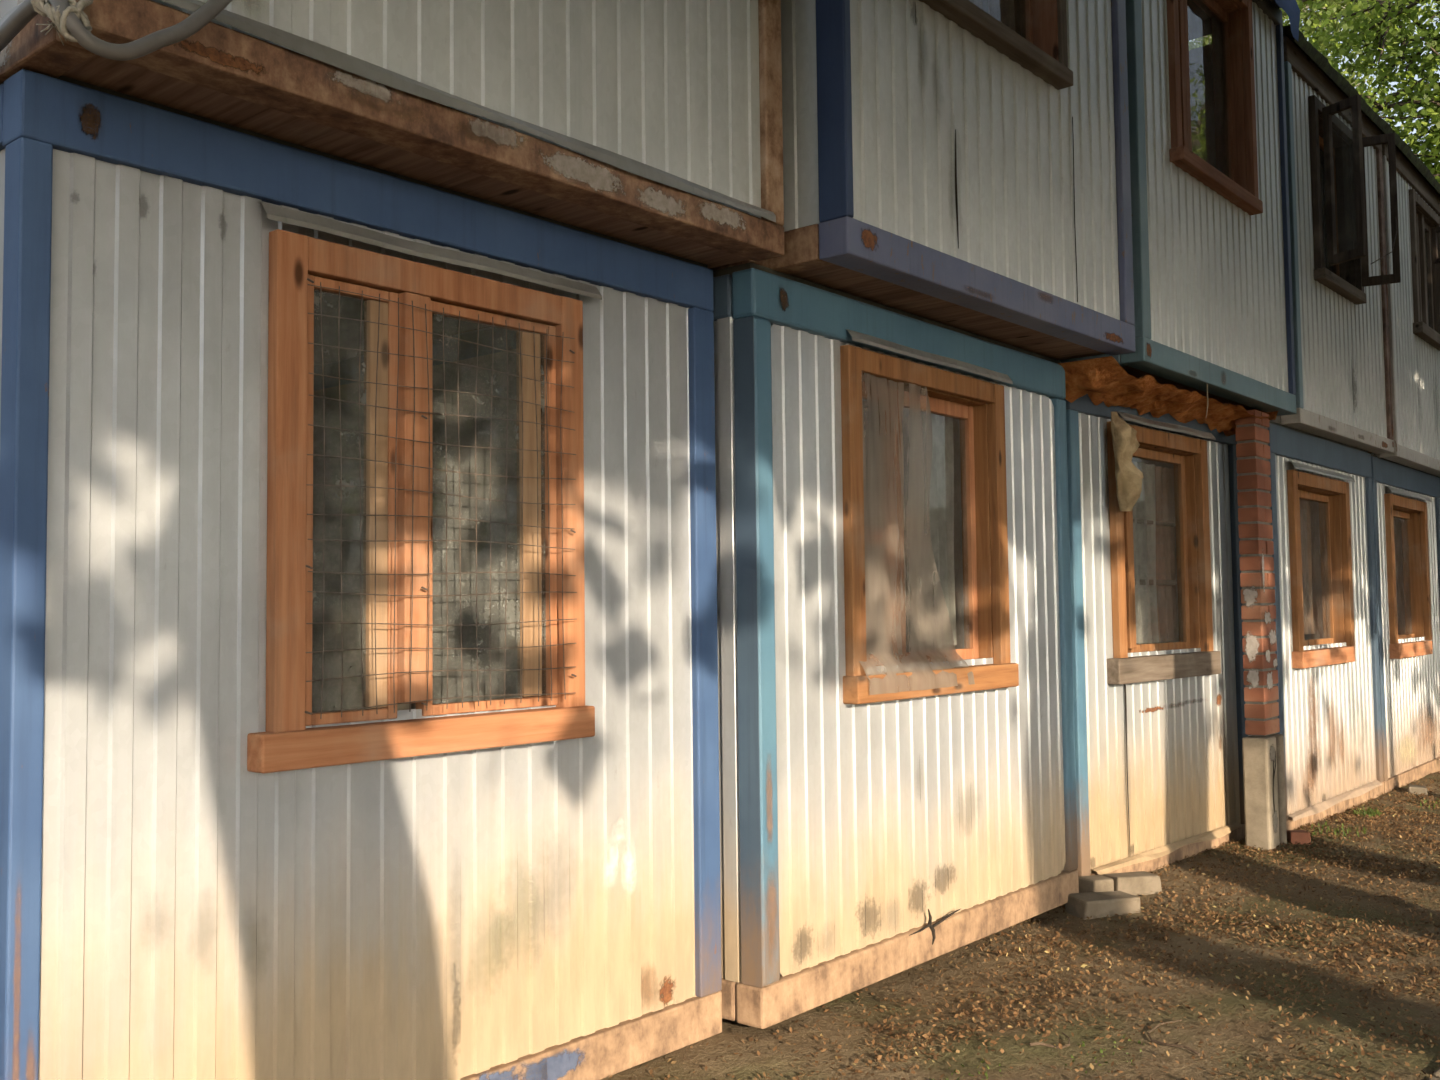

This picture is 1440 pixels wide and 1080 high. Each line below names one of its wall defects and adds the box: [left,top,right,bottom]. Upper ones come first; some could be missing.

corrosion [80,103,101,140]
peeling [479,1049,585,1080]